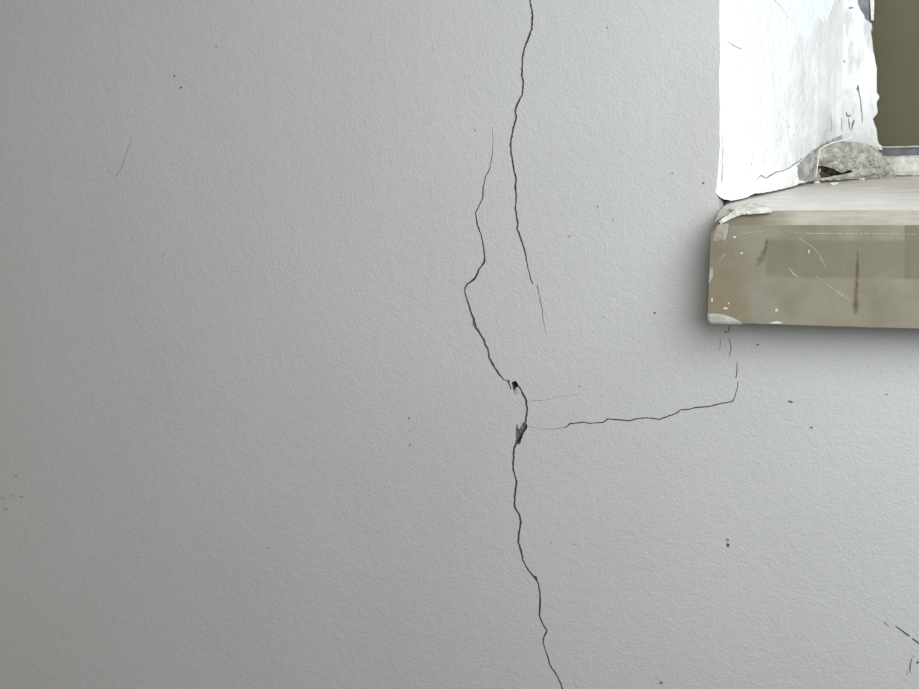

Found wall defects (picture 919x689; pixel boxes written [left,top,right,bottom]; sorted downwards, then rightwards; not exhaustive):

peeling [775,0,840,39]
spalling [757,85,897,194]
crack [464,0,738,689]